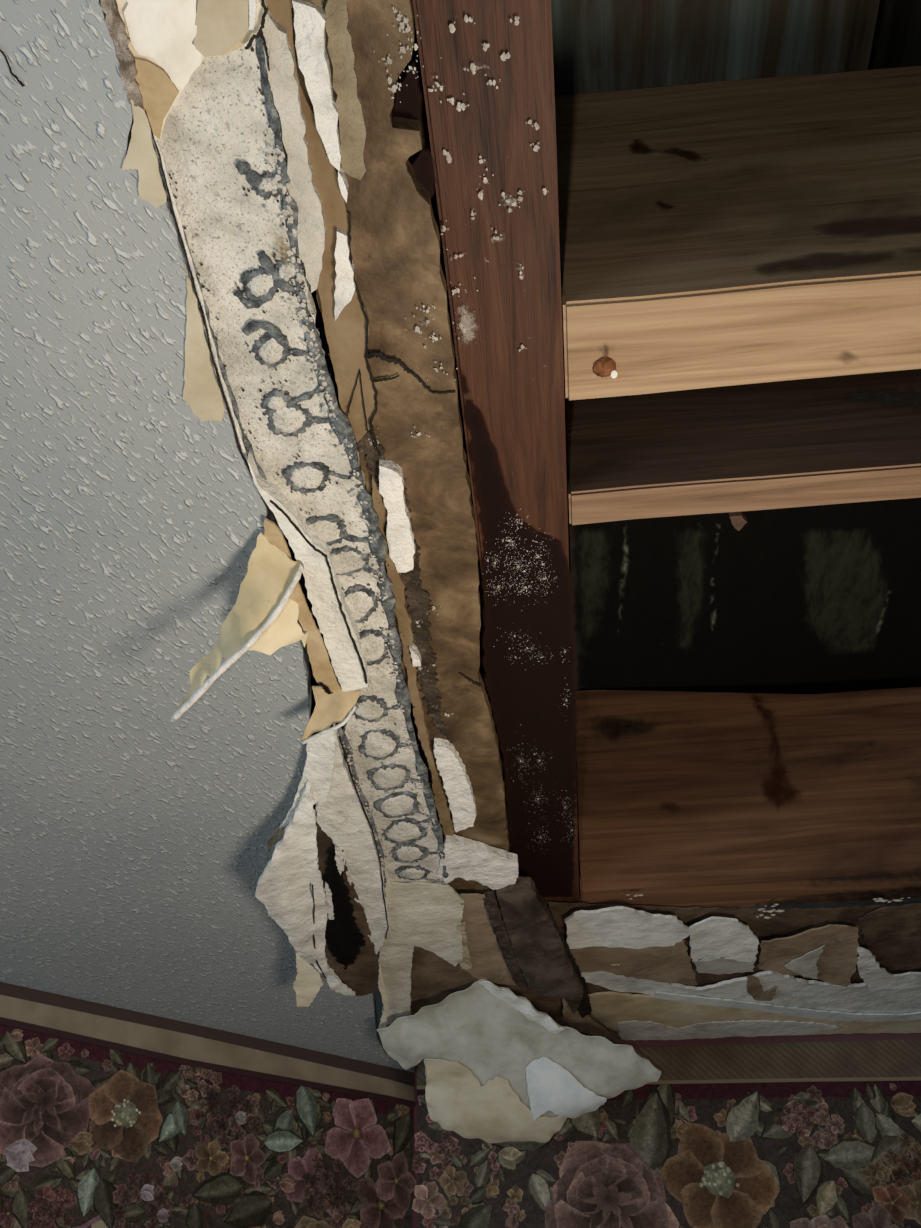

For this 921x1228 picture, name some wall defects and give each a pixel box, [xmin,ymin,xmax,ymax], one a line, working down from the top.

flaking render [101,0,519,890]
flaking render [565,906,692,949]
flaking render [581,964,921,1022]